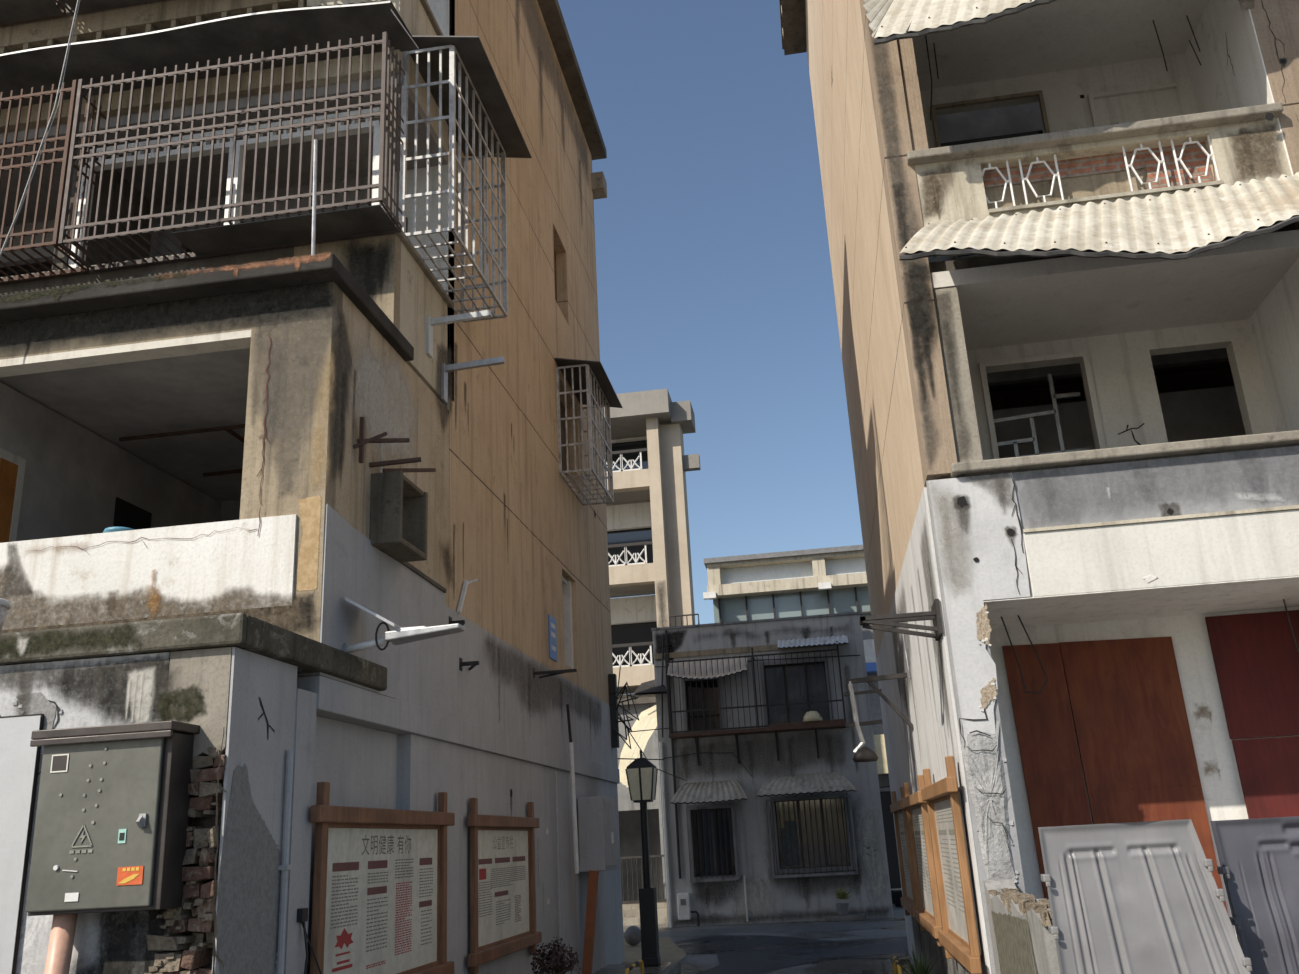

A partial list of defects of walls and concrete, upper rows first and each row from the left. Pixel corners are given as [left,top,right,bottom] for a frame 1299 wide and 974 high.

crack [1262,3,1299,122]
leakage [896,186,907,244]
leakage [923,166,951,219]
leakage [1231,126,1280,179]
crack [31,328,271,551]
crack [1011,477,1024,595]
leakage [0,545,312,653]
spalling [976,604,992,647]
leakage [0,660,171,723]
spalling [961,678,1019,883]
flaking render [144,747,281,974]
flaking render [991,911,1038,974]